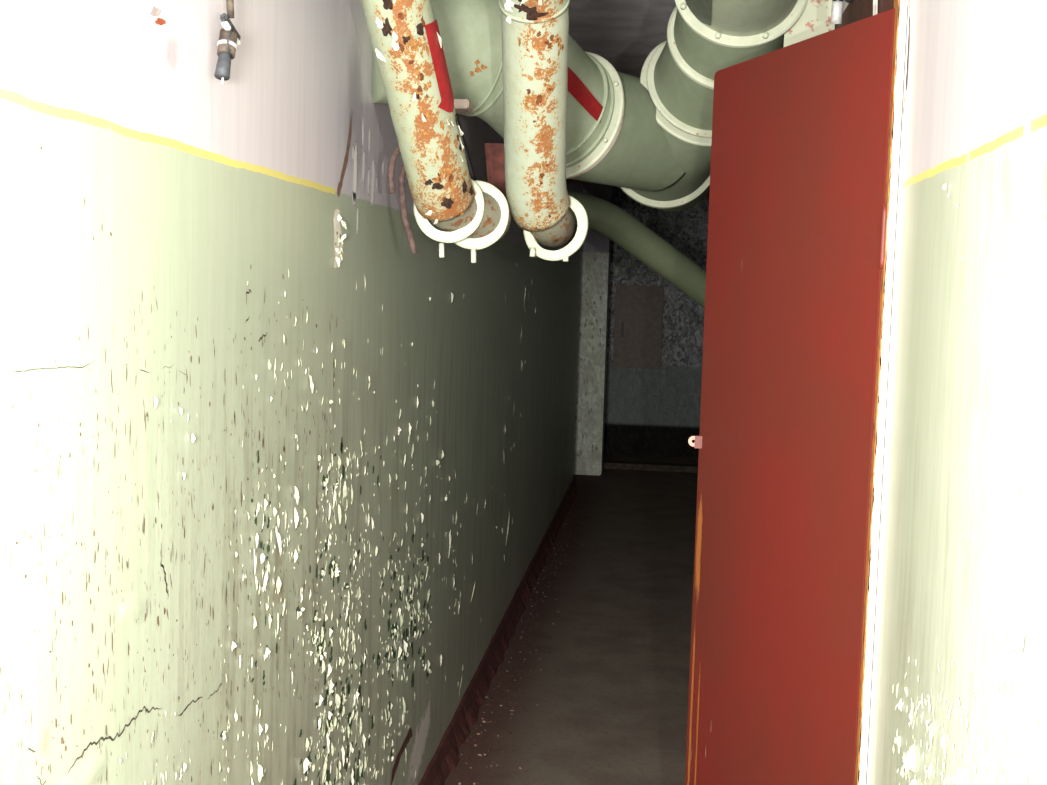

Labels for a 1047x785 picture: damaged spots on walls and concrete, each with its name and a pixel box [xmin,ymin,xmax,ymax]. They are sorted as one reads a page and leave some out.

peeling [268,339,375,428]
peeling [219,383,486,785]
crack [28,681,223,785]
peeling [892,653,1047,785]